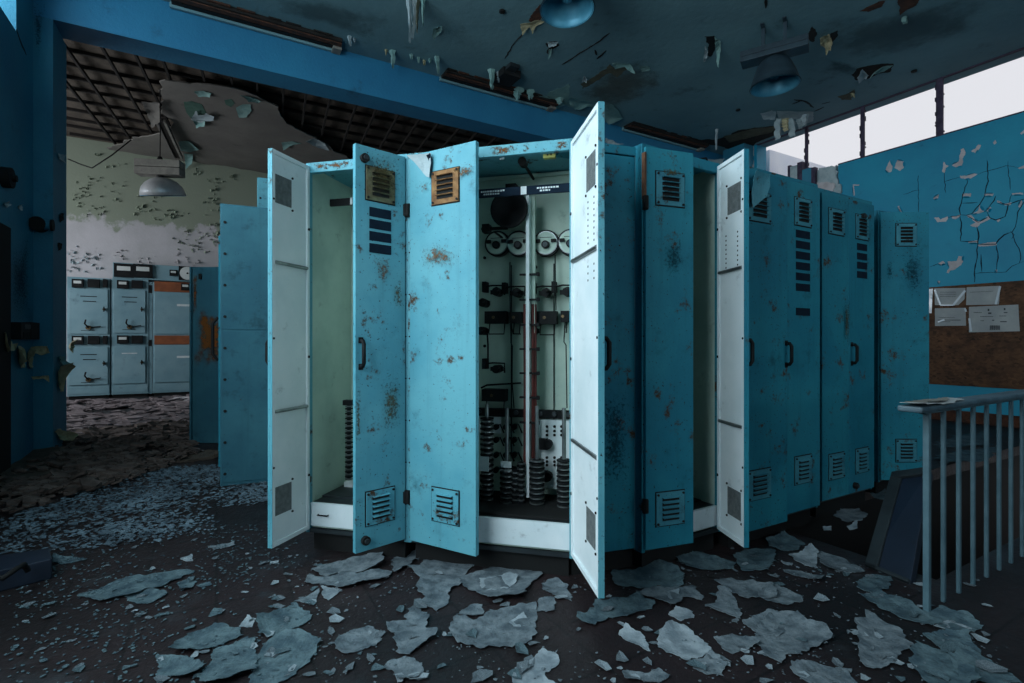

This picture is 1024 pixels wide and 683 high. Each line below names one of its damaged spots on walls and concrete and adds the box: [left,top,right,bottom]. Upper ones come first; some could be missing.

peeling [520,5,544,35]
peeling [861,0,919,24]
peeling [703,36,721,66]
peeling [808,27,838,55]
flaking render [142,102,160,128]
peeling [184,91,214,128]
peeling [540,63,651,124]
peeling [838,63,894,100]
peeling [942,140,997,180]
peeling [935,193,1023,227]
crack [944,161,1024,282]
peeling [5,333,79,392]